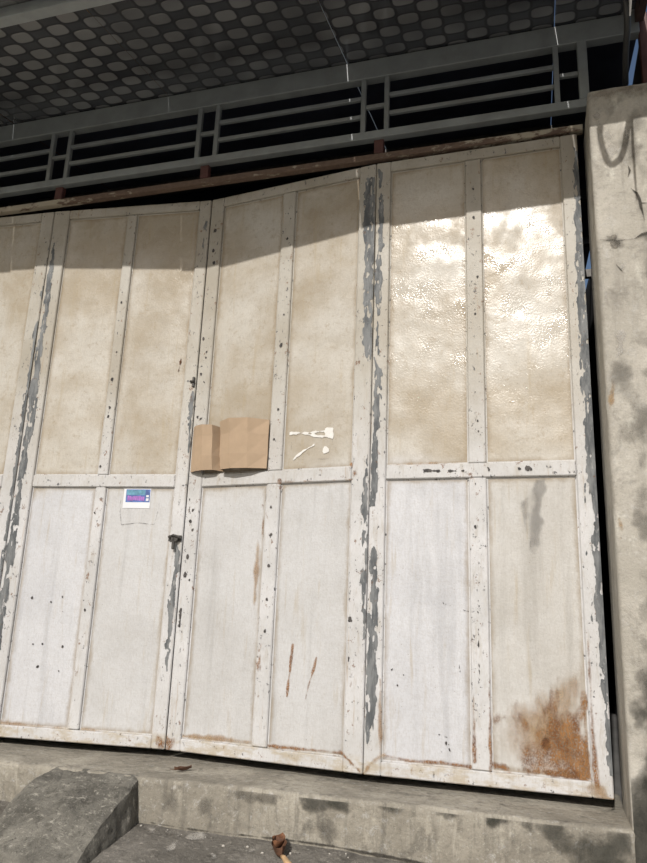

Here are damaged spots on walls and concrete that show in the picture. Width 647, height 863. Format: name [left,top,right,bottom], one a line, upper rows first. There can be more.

crack [609,167,647,242]
peeling [0,237,55,650]
peeling [360,169,385,744]
peeling [572,147,613,777]
corrosion [523,696,605,796]